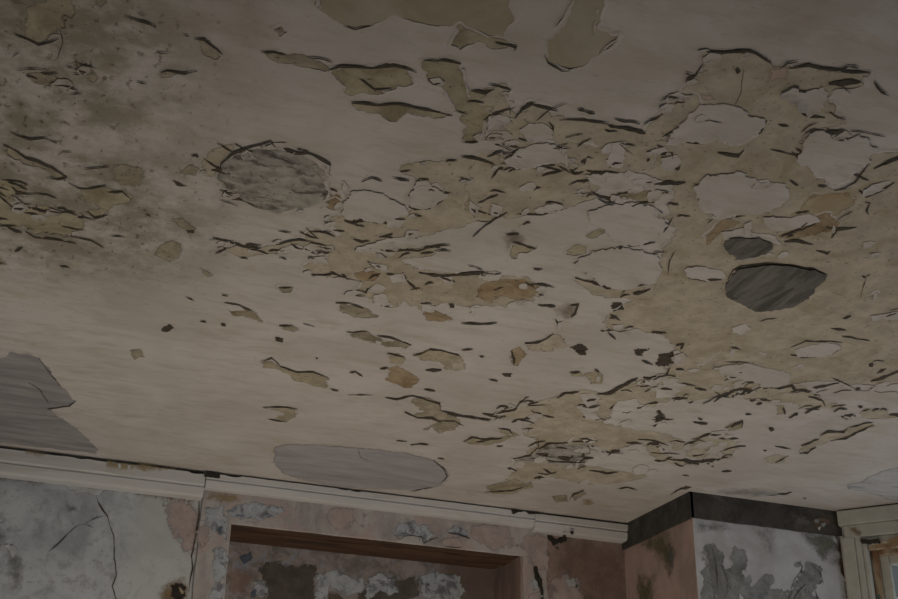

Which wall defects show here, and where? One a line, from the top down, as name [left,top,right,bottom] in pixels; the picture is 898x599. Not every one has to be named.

peeling [158,68,197,79]
peeling [150,215,199,262]
peeling [170,0,898,505]
peeling [158,323,176,333]
flaking render [0,351,101,454]
crack [49,496,117,599]
peeling [196,494,285,599]
peeling [254,561,466,599]
peeling [393,520,574,599]
flaking render [700,544,824,599]